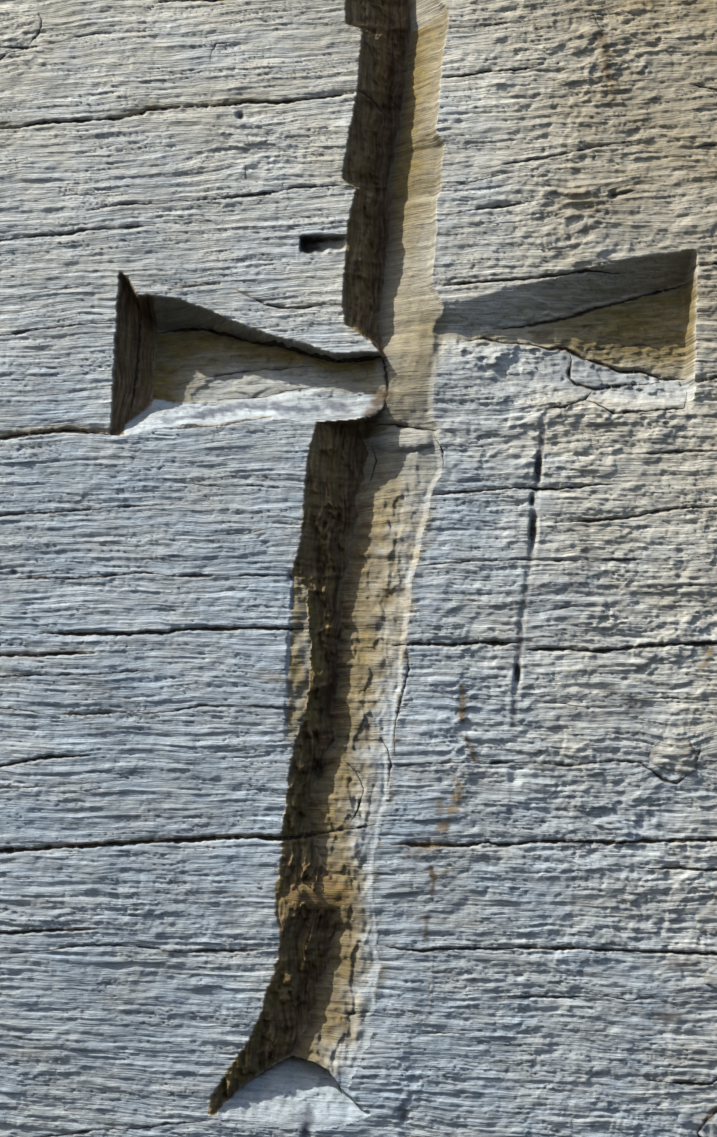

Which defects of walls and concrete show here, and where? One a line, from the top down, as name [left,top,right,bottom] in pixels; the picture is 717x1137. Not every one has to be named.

crack [438,64,543,80]
crack [0,89,393,129]
crack [441,137,652,215]
crack [445,262,717,414]
crack [131,313,444,492]
crack [0,429,120,440]
crack [431,483,616,496]
crack [555,505,717,523]
crack [0,572,288,581]
crack [424,557,639,565]
crack [0,627,314,678]
crack [0,641,717,871]